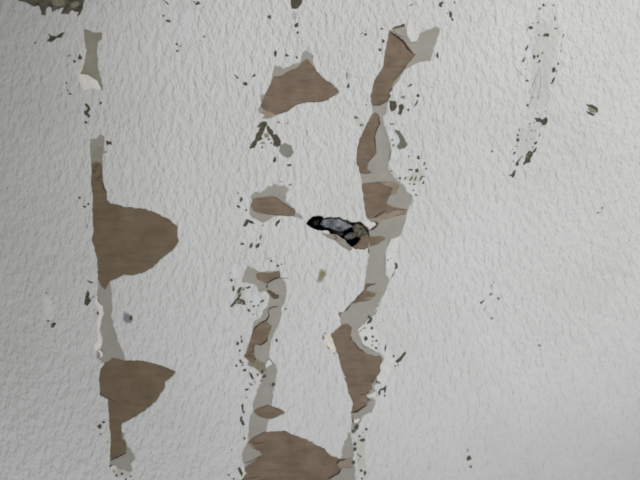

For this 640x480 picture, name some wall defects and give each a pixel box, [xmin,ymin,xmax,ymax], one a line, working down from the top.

peeling [19,0,102,90]
peeling [83,135,179,480]
peeling [228,24,439,480]